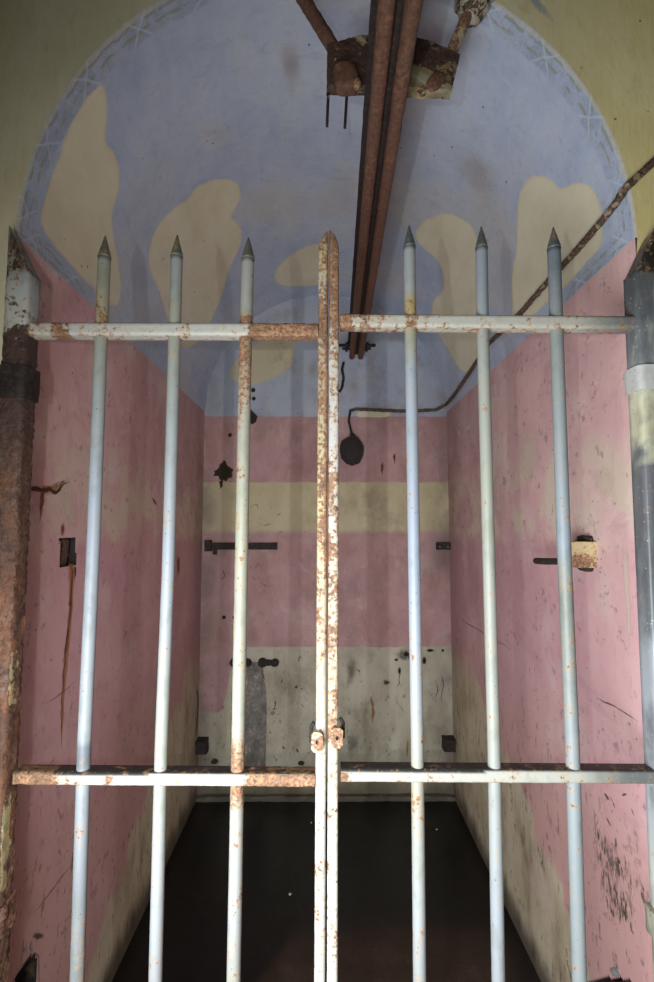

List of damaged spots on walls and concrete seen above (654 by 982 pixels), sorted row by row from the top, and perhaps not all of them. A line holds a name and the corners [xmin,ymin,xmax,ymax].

rust [61,564,76,745]
water stain [597,832,634,934]